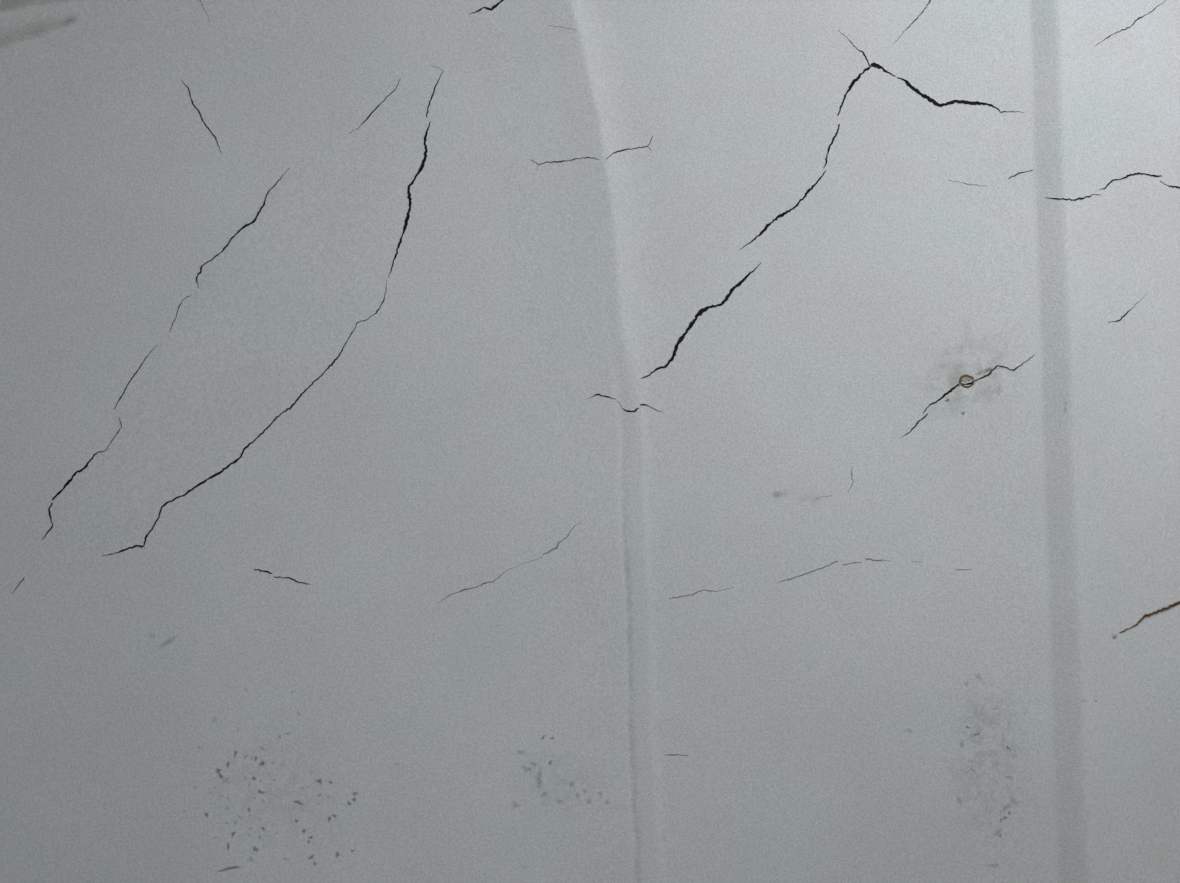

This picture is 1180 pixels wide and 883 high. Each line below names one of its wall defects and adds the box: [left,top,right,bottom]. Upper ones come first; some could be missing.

crack [469,0,505,15]
crack [530,136,654,171]
crack [588,0,1033,413]
crack [1045,171,1180,202]
crack [102,65,444,556]
crack [42,167,290,540]
crack [899,354,1035,438]
crack [254,568,311,585]
crack [437,522,581,604]
crack [1119,601,1180,634]